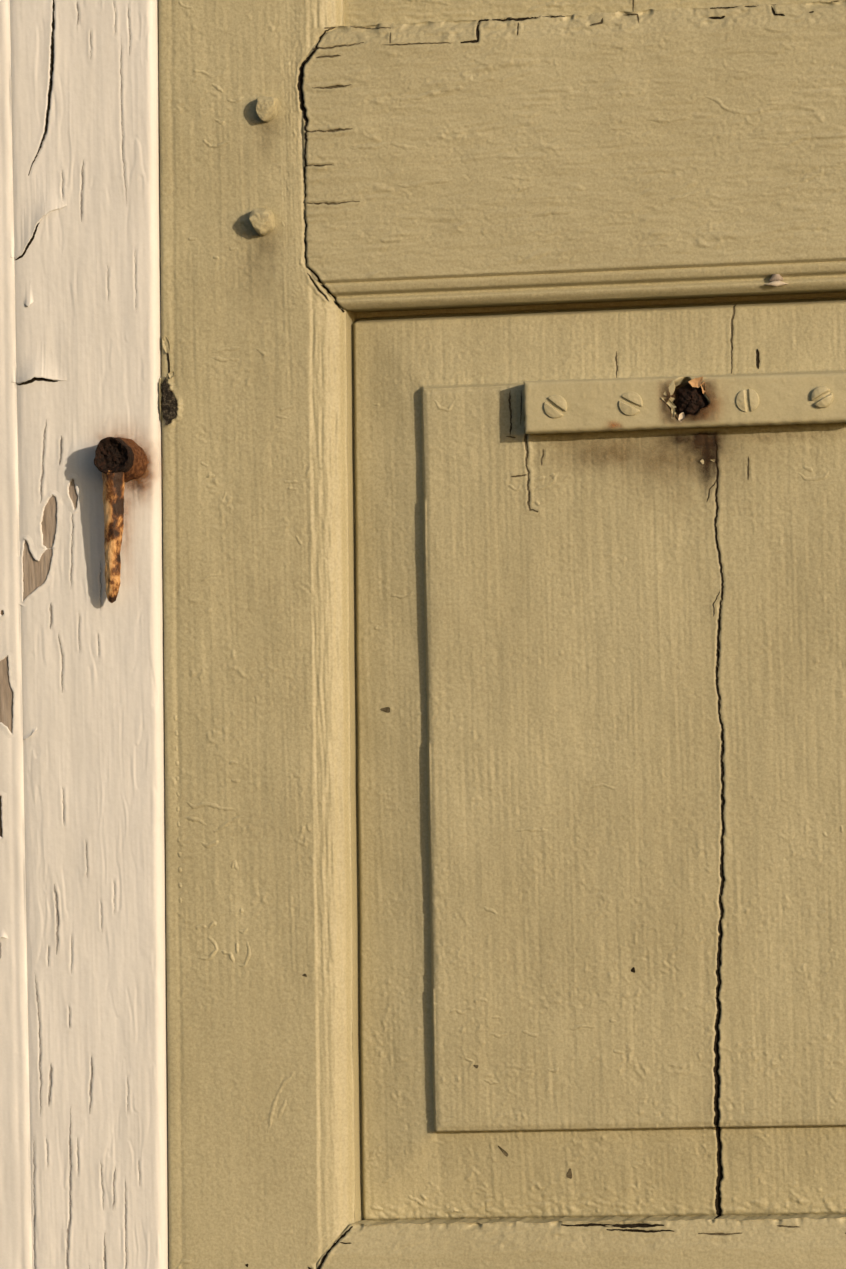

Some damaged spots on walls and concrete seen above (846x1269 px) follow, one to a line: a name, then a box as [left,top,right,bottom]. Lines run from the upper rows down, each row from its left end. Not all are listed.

crack [709,1,838,19]
crack [28,0,130,200]
crack [297,0,639,312]
peeling [10,172,67,260]
peeling [11,340,67,385]
spalling [159,336,184,430]
corrosion [665,383,721,477]
peeling [0,473,84,621]
peeling [0,650,37,740]
peeling [0,790,8,844]
crack [561,435,749,1235]
crack [308,1226,353,1269]